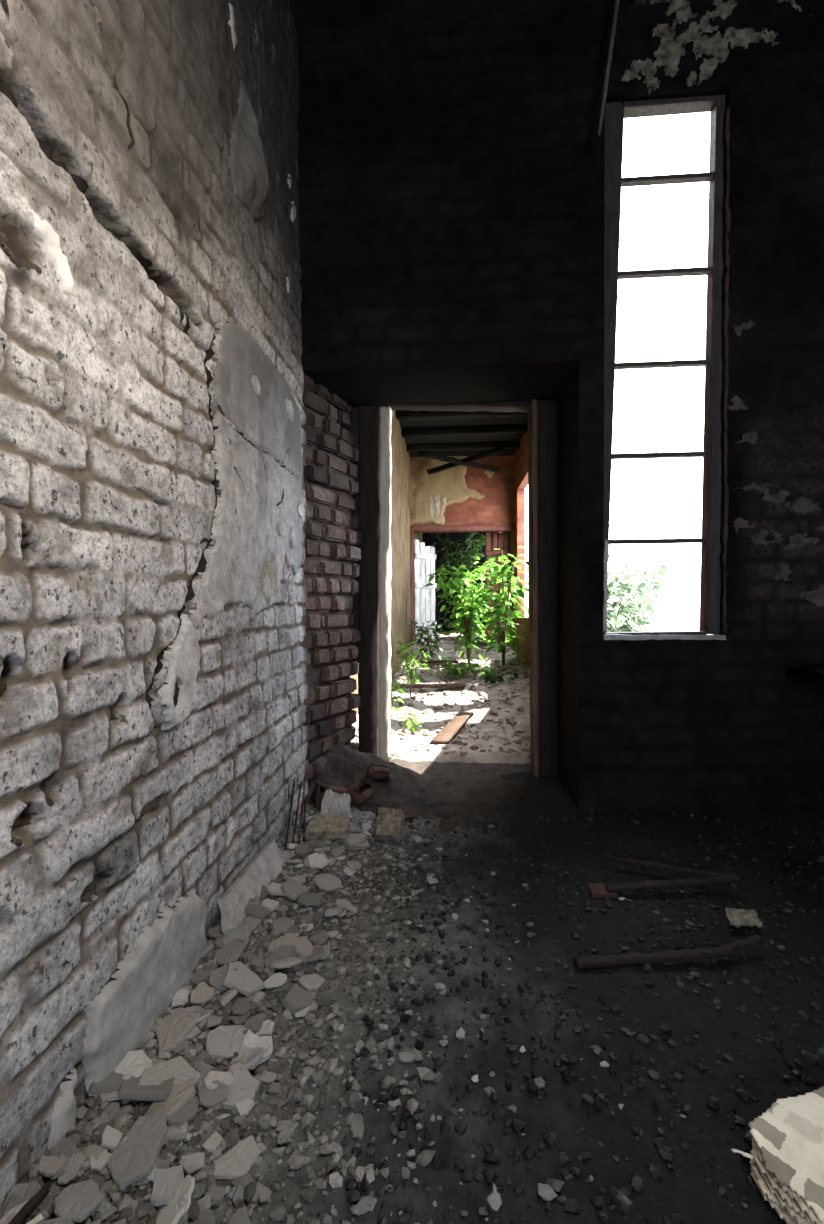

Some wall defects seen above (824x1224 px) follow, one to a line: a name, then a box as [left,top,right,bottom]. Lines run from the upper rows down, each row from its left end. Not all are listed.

peeling [621,0,779,95]
spalling [0,83,18,108]
spalling [33,132,89,201]
peeling [288,173,296,223]
flaking render [0,207,74,296]
spalling [96,219,161,281]
crack [145,334,293,714]
flaking render [410,456,484,526]
spalling [10,771,56,847]
spalling [136,796,163,822]
spalling [80,871,115,903]
flaking render [48,892,207,1150]